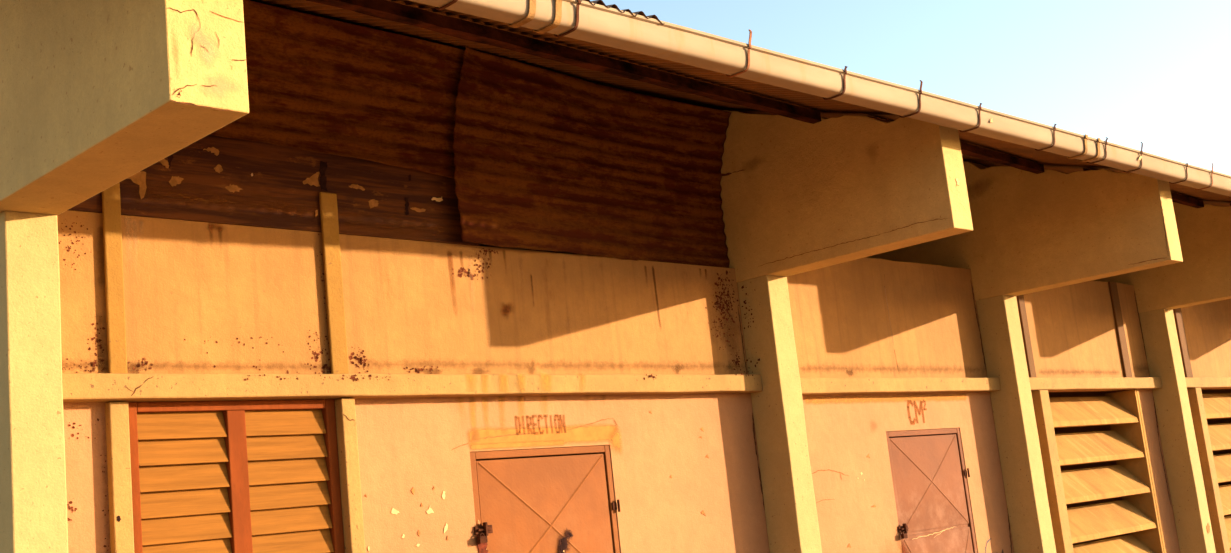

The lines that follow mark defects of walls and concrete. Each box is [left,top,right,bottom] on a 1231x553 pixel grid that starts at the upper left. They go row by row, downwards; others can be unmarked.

peeling [126,171,147,199]
peeling [159,159,183,187]
peeling [203,147,223,173]
peeling [303,172,320,187]
peeling [349,184,379,209]
peeling [405,197,443,215]
crack [761,218,948,266]
damp [452,247,498,280]
damp [705,270,760,377]
damp [62,316,105,373]
damp [244,330,389,382]